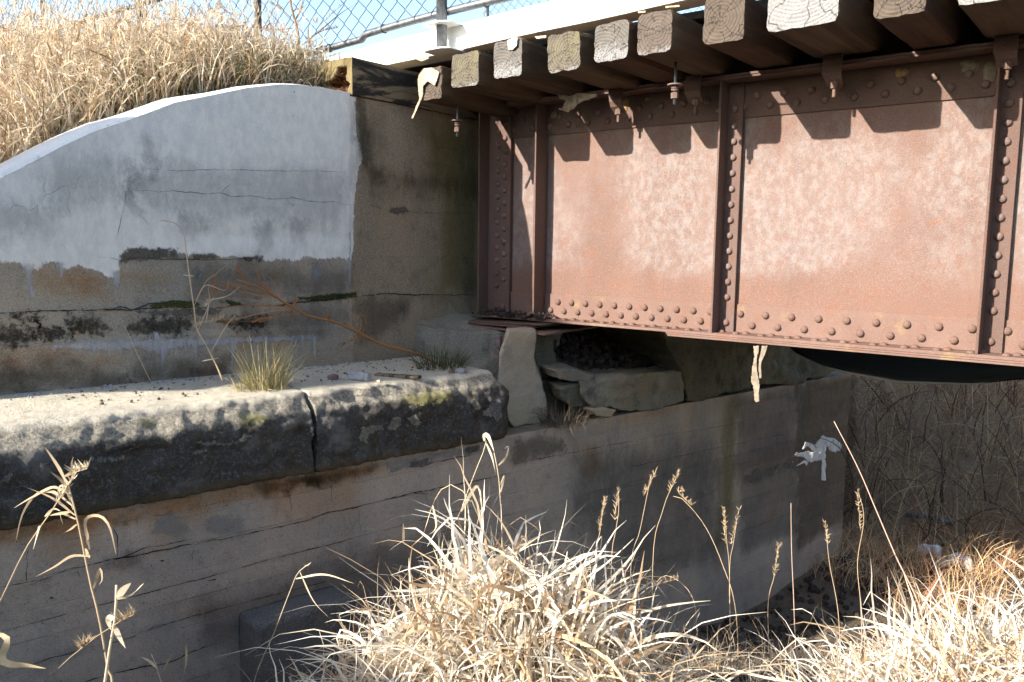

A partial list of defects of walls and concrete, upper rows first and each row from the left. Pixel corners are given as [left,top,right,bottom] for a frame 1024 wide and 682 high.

peeling [0,85,363,298]
crack [110,168,474,260]